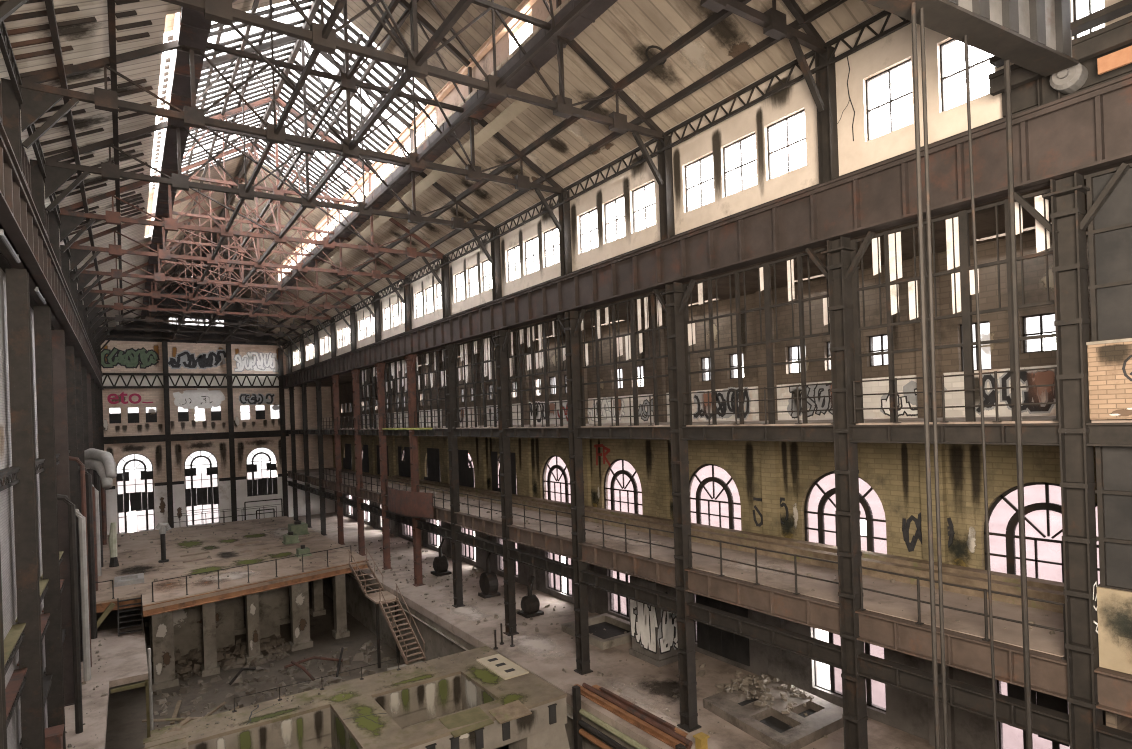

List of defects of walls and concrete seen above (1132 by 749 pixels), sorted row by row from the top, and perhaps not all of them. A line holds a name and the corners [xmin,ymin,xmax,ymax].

damp [705,11,740,48]
damp [637,46,673,81]
damp [683,42,706,68]
damp [1103,603,1132,640]